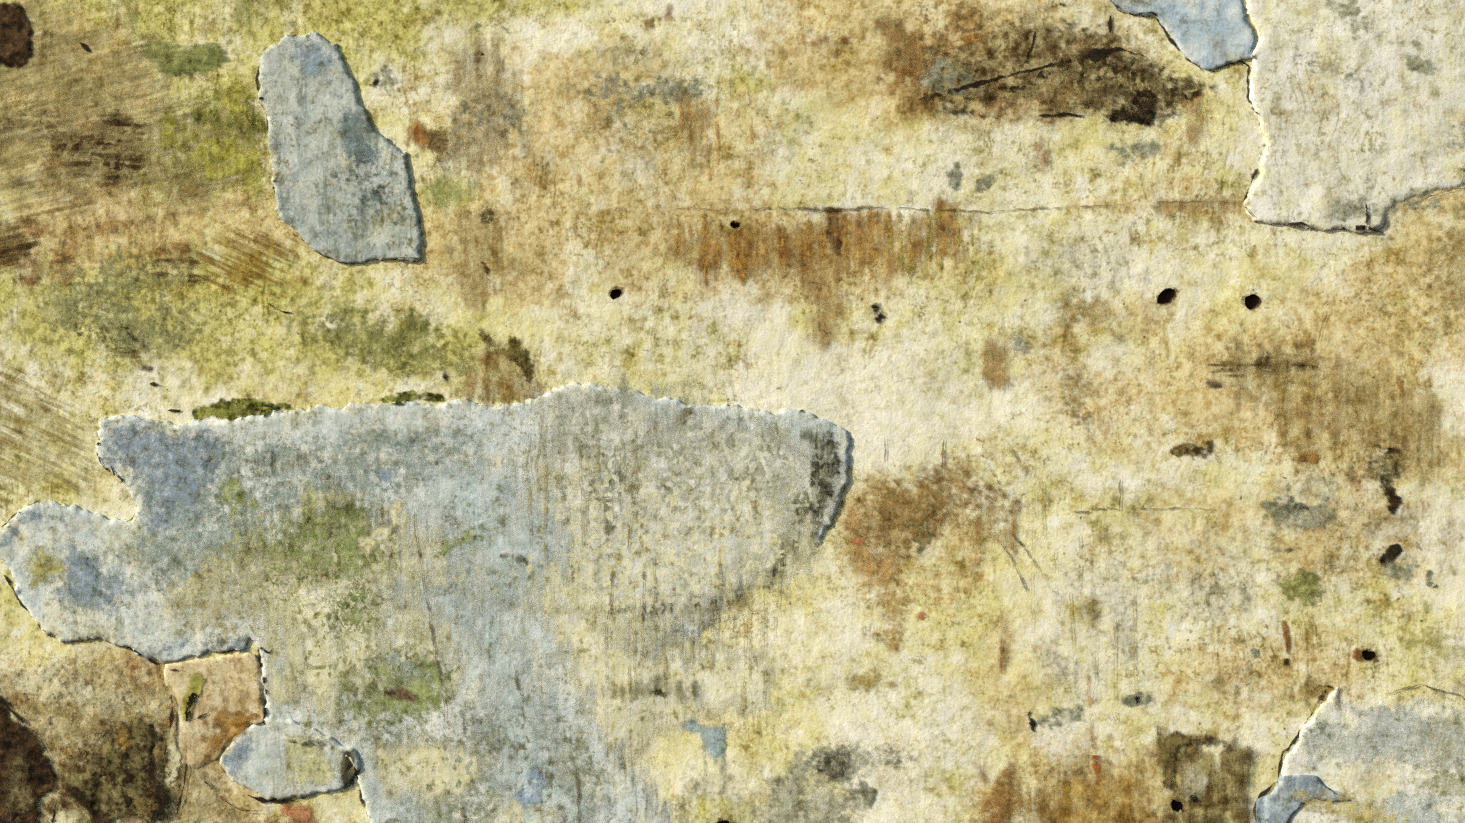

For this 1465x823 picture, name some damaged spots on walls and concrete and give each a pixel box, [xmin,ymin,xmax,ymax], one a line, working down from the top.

peeling [258,31,422,264]
leakage [1034,142,1050,168]
leakage [874,3,1213,145]
peeling [1111,0,1465,234]
corrosion [669,200,973,348]
peeling [0,381,850,823]
corrosion [843,463,1020,649]
peeling [1156,687,1465,823]